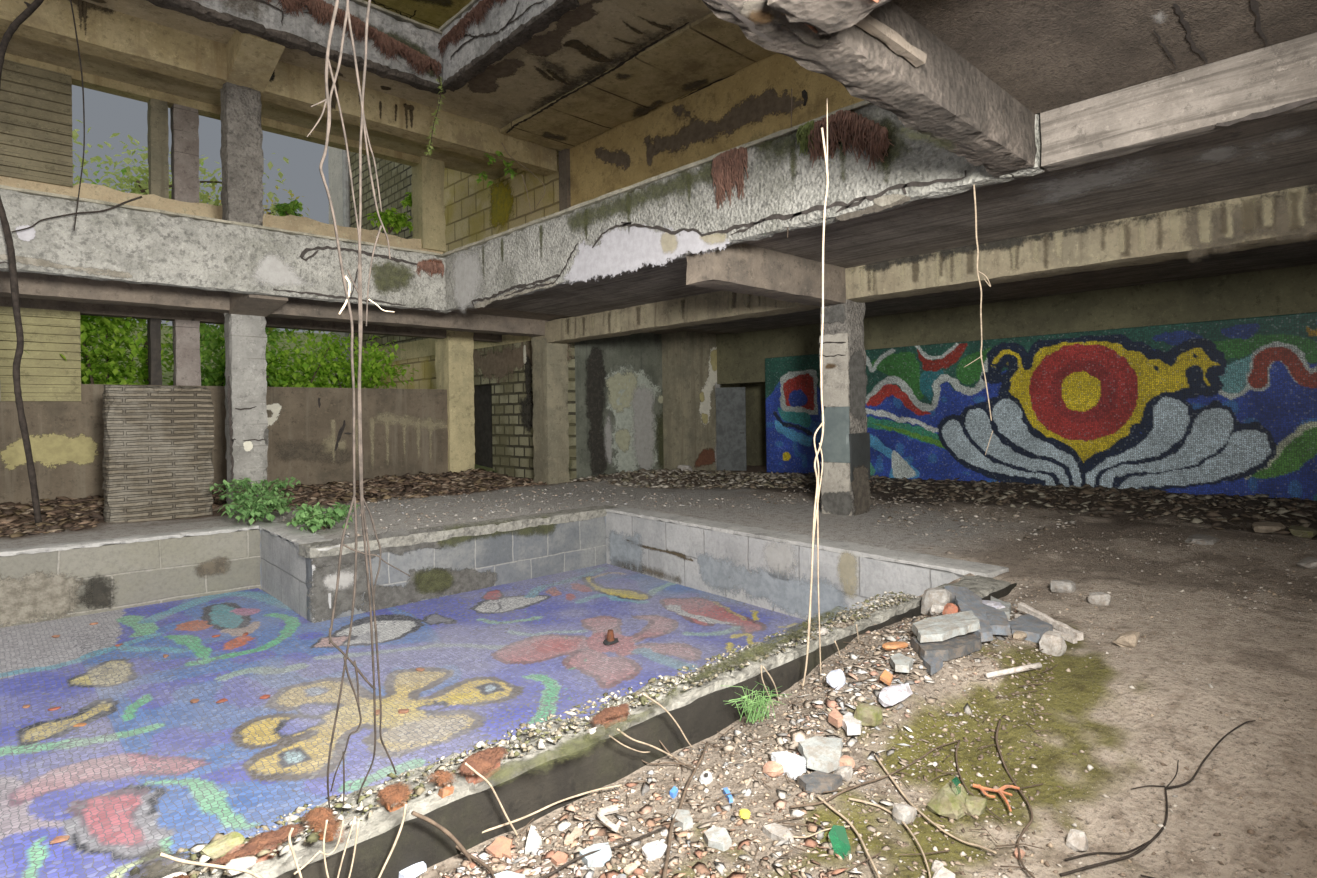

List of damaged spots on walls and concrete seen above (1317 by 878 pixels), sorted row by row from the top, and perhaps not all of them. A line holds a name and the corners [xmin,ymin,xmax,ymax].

water stain [532,22,684,111]
water stain [633,100,664,117]
crack [1216,97,1317,126]
peeling [474,224,730,308]
crack [273,145,977,313]
water stain [568,162,715,239]
peeling [605,364,663,473]